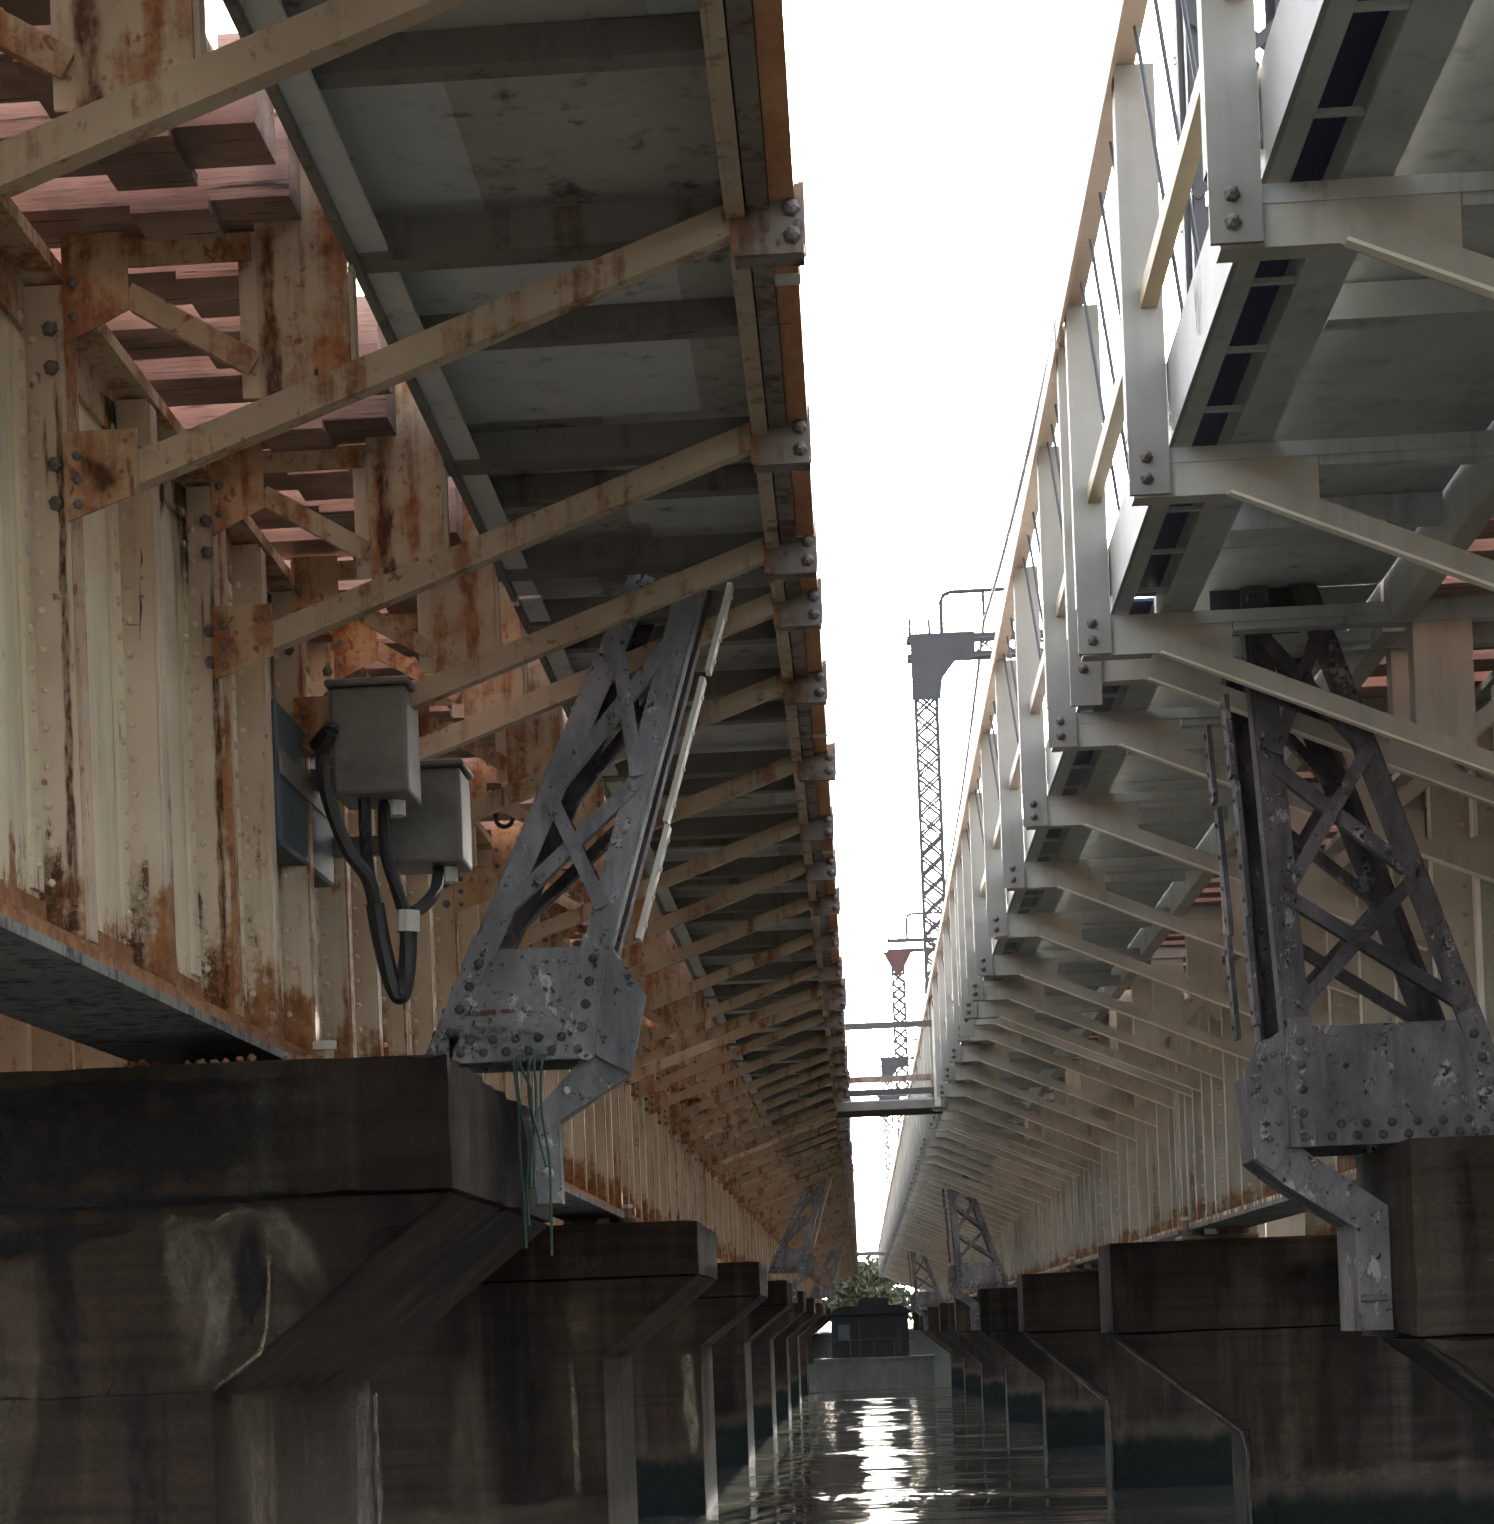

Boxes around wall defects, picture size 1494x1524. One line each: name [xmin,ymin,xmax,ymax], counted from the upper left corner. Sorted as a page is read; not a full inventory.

corrosion [73,0,103,107]
corrosion [87,460,133,491]
corrosion [213,656,229,1007]
damp [206,1234,270,1373]
damp [1117,1340,1252,1519]